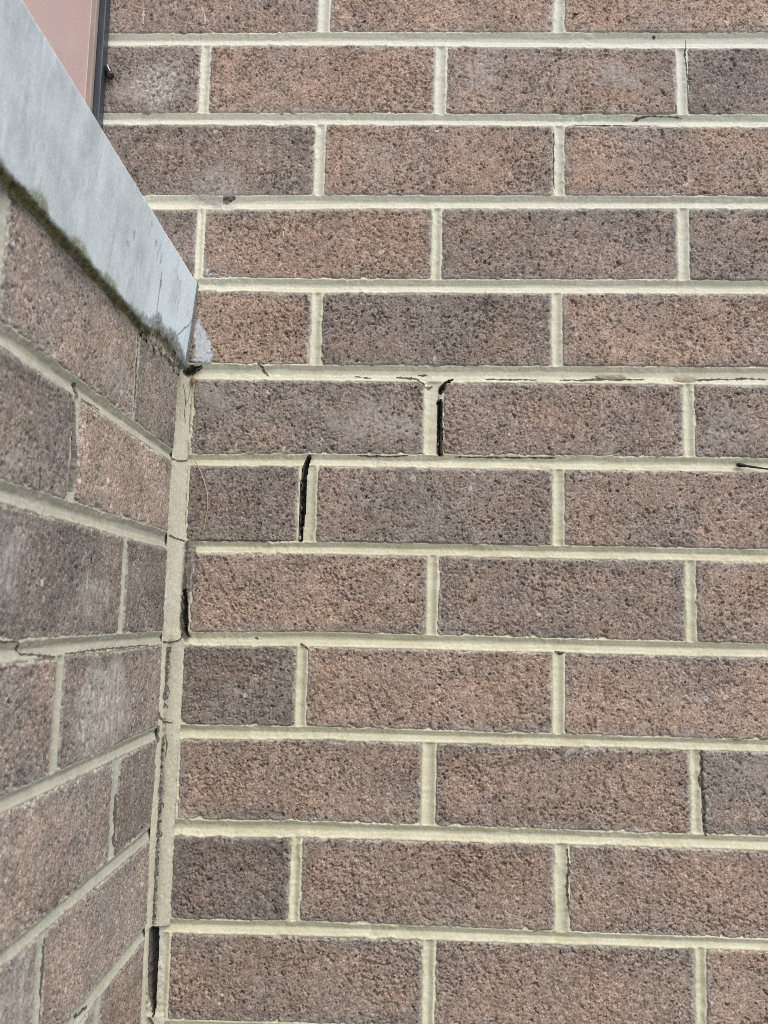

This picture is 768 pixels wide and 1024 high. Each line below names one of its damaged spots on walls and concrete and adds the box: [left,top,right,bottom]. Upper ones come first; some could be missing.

crack [563,376,644,384]
crack [697,375,767,383]
crack [396,374,555,459]
crack [357,452,408,460]
crack [0,455,311,924]